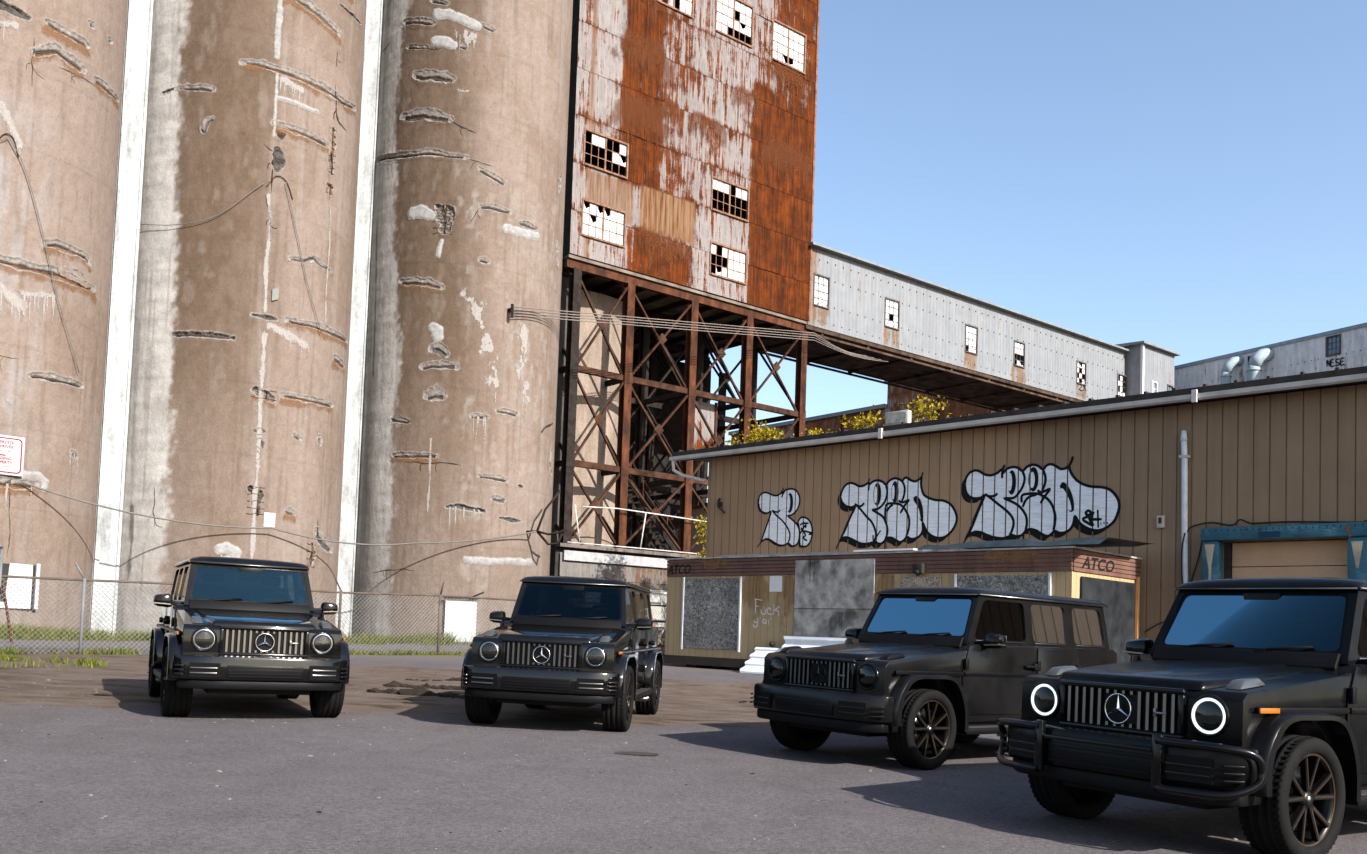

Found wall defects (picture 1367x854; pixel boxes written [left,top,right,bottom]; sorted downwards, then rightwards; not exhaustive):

spalling [0,0,120,108]
spalling [234,55,357,116]
water stain [456,29,477,51]
corrosion [612,0,727,146]
corrosion [735,86,762,122]
corrosion [772,65,805,95]
spalling [266,115,339,200]
spalling [375,145,560,269]
spalling [0,235,99,302]
corrosion [634,227,688,270]